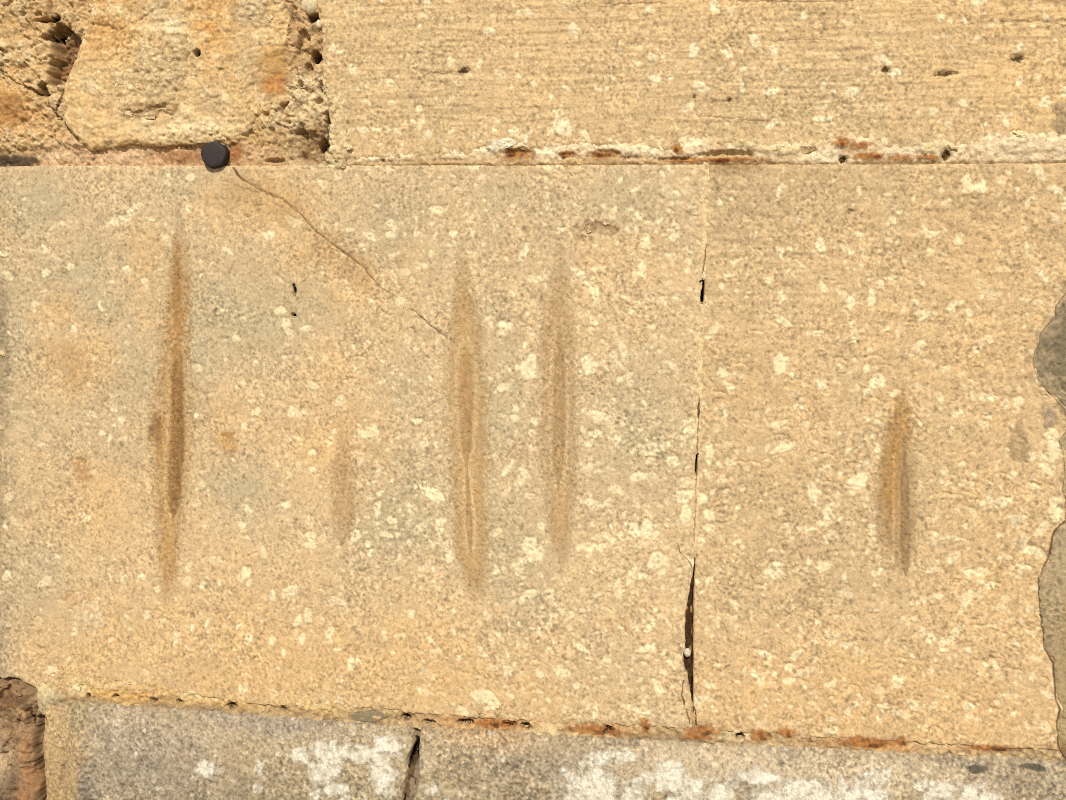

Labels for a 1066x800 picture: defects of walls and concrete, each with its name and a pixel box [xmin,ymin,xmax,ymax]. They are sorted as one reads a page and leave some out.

corrosion [504,148,534,160]
corrosion [560,149,618,159]
corrosion [833,137,939,161]
crack [233,167,385,290]
crack [699,244,707,304]
crack [693,399,701,479]
crack [678,545,697,725]
corrosion [478,719,514,728]
corrosion [566,725,617,735]
corrosion [752,728,794,741]
corrosion [845,736,907,749]
crack [404,739,420,797]